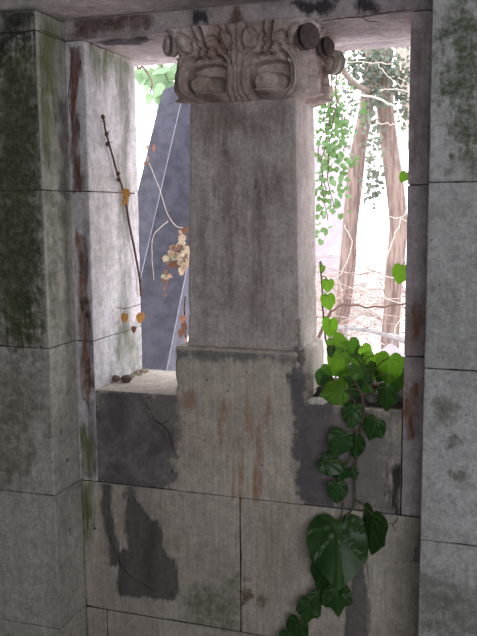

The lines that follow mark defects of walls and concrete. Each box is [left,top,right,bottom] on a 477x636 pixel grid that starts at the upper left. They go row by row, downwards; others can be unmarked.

damp [293,0,338,15]
damp [354,0,380,13]
damp [40,27,69,197]
rust [75,231,91,401]
damp [83,392,178,601]
damp [286,366,395,513]